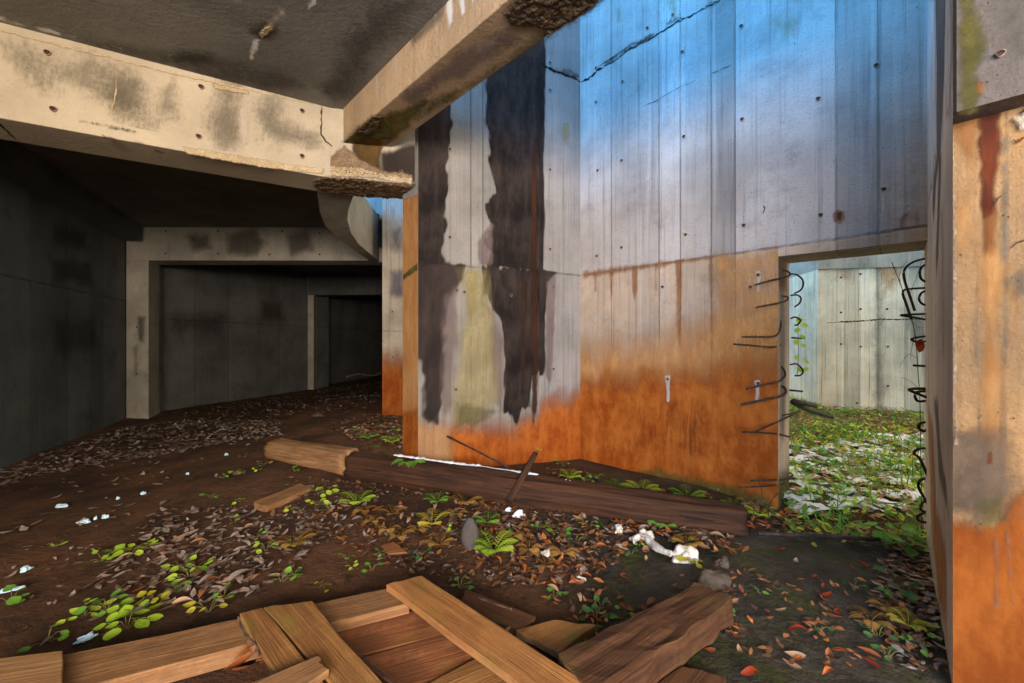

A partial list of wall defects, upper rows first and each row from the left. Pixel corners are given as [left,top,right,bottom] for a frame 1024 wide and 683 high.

damp [250,24,273,59]
spalling [406,0,604,103]
crack [540,0,720,82]
crack [320,105,332,146]
spalling [184,146,413,199]
damp [353,39,556,424]
corrosion [953,112,1007,308]
corrosion [382,152,789,510]
spalling [733,269,804,348]
spalling [900,258,925,320]
spalling [907,387,927,403]
corrosion [928,415,1024,683]